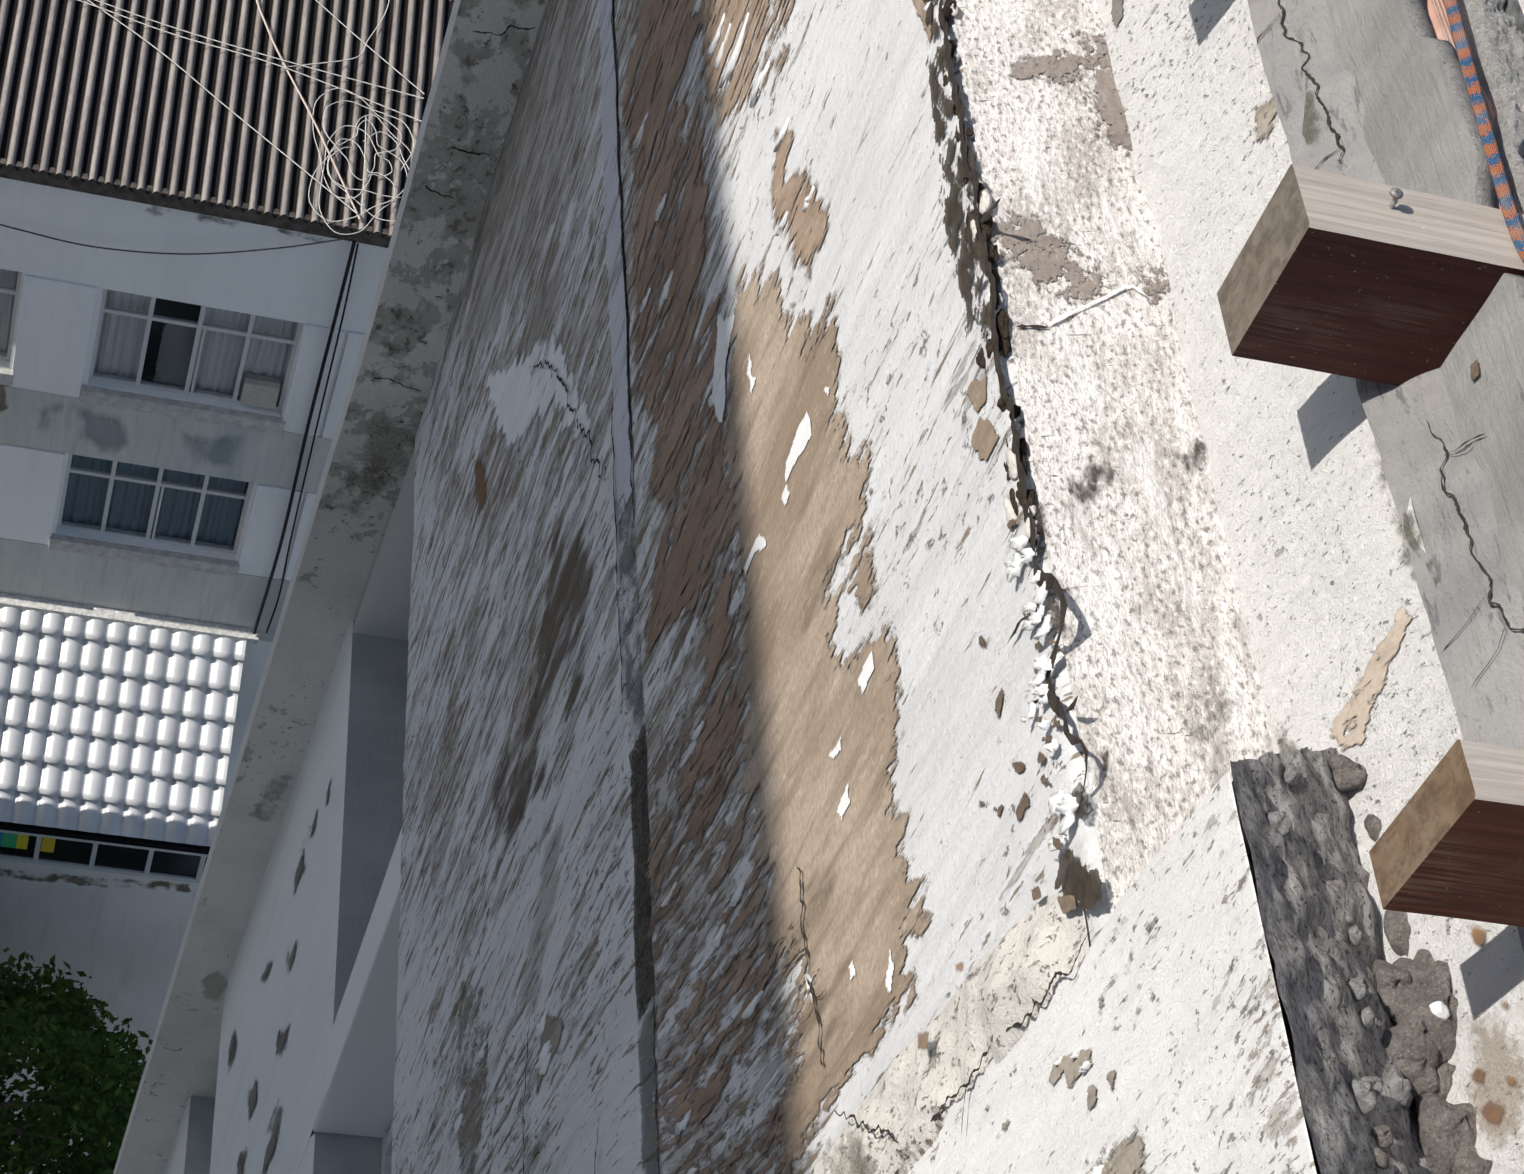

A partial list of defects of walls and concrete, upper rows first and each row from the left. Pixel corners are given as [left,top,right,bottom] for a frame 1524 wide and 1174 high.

peeling [1008,0,1133,155]
crack [1254,0,1345,169]
spalling [1404,0,1497,208]
crack [528,0,635,692]
peeling [621,0,932,1174]
spalling [912,0,1110,914]
crack [1427,422,1524,689]
crack [784,867,825,1066]
crack [930,929,1093,1133]
peeling [1429,1001,1450,1021]
crack [834,1110,905,1174]
peeling [1083,1118,1146,1174]